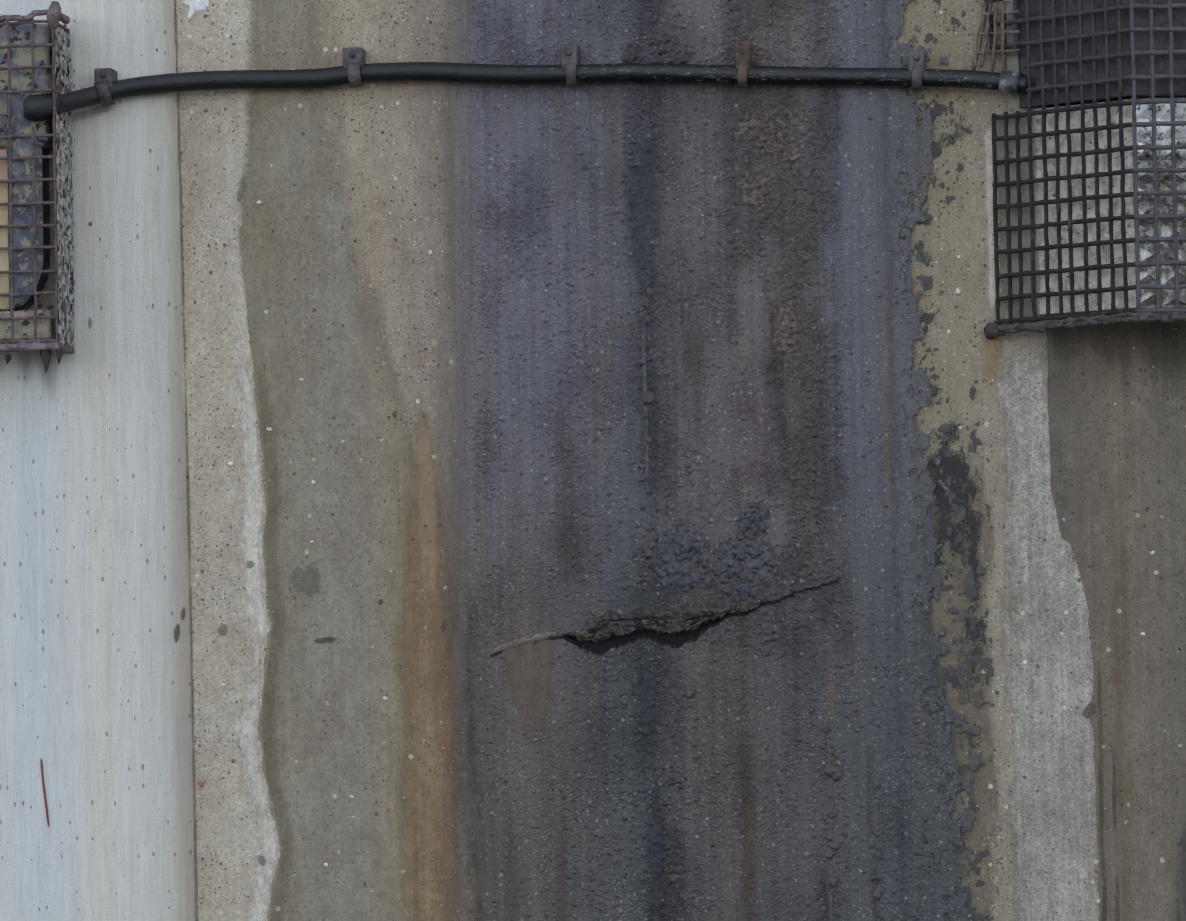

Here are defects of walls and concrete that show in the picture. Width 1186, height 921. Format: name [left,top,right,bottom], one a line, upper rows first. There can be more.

leakage [449,0,893,68]
peeling [883,0,966,68]
corrosion [402,514,457,921]
crack [490,579,839,657]
leakage [445,82,936,921]
peeling [884,86,999,921]